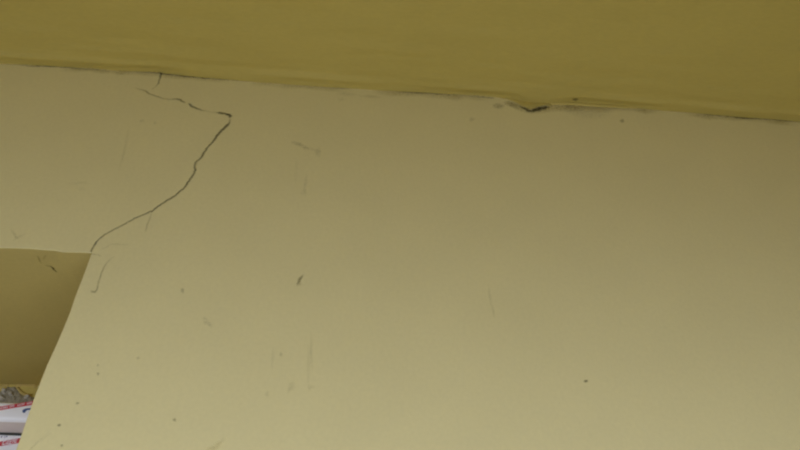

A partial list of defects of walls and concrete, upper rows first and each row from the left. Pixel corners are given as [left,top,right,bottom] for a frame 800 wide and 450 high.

crack [136,113,231,218]